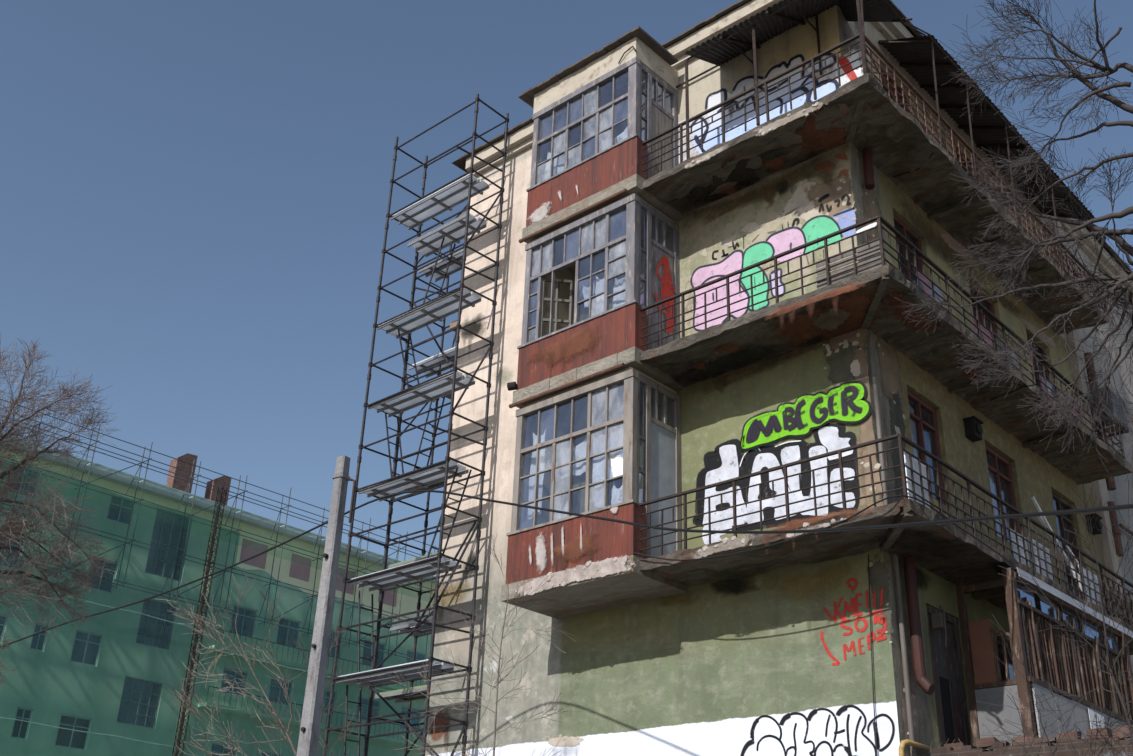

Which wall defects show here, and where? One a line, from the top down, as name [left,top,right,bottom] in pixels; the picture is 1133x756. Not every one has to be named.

peeling [530,191,561,222]
flaking render [776,152,881,241]
spalling [512,528,635,596]